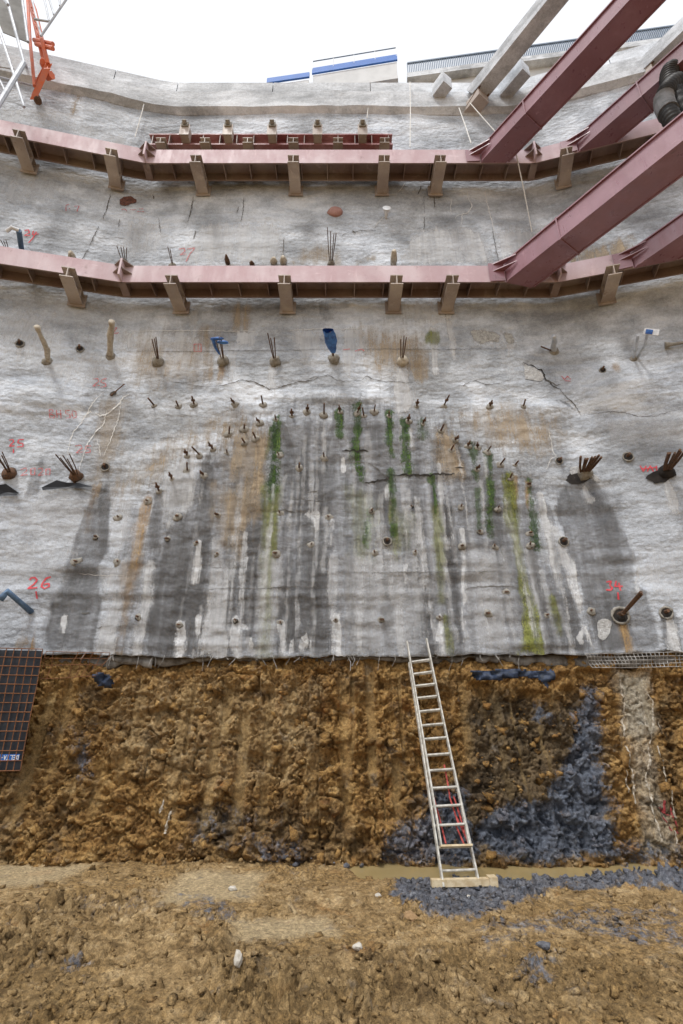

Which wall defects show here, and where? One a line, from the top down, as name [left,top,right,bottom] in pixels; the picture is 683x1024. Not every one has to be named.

crack [172,375,412,390]
crack [446,362,682,417]
crack [342,449,464,484]
water stain [52,573,73,633]
water stain [133,560,154,655]
water stain [174,615,202,658]
water stain [191,515,203,584]
water stain [229,600,248,658]
water stain [277,543,343,656]
water stain [429,614,447,656]
water stain [435,508,467,637]
water stain [538,492,640,649]